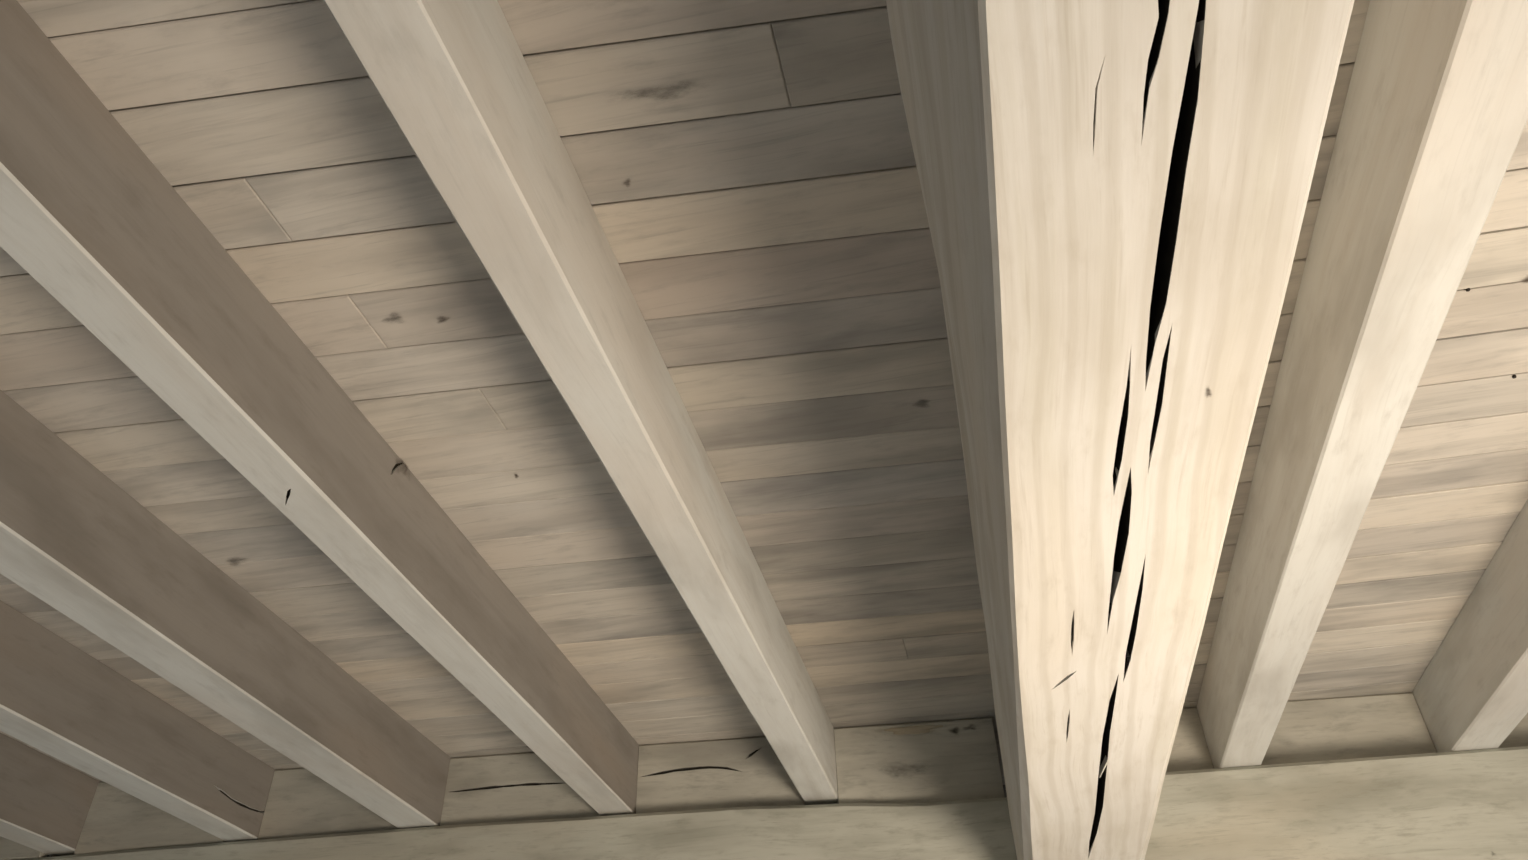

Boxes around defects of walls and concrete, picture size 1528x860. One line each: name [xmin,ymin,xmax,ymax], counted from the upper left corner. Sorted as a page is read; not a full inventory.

crack [1055,0,1206,851]
crack [642,750,758,777]
crack [453,783,563,792]